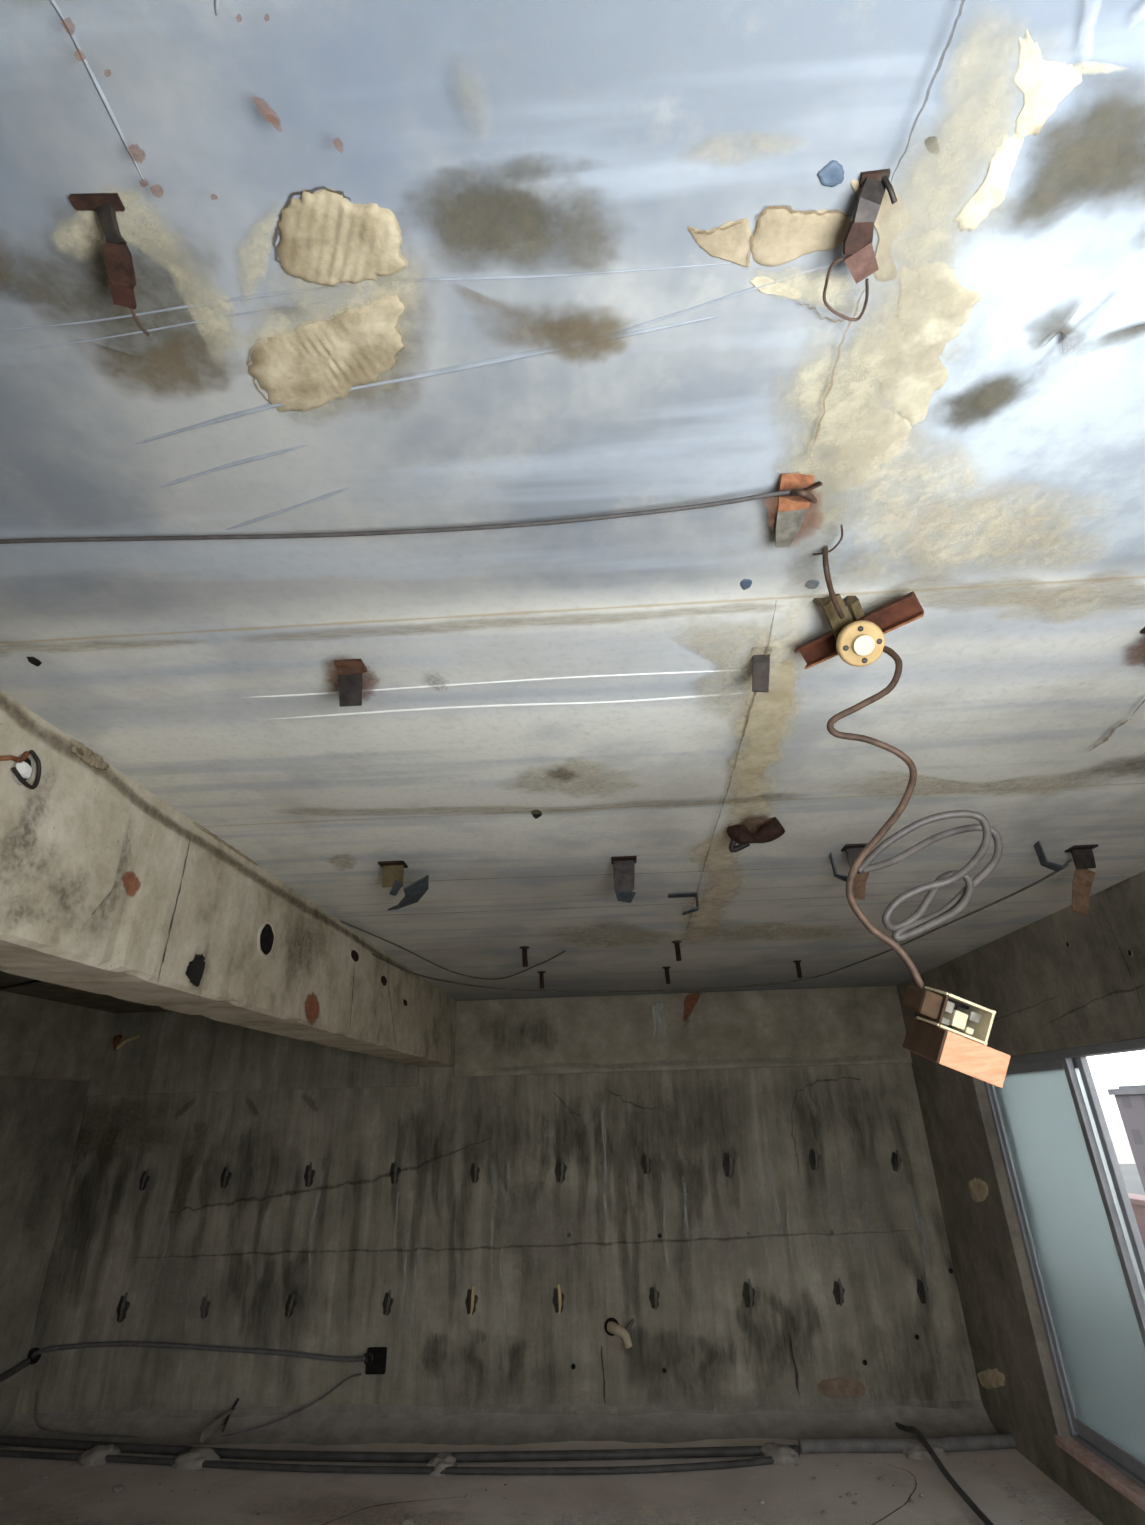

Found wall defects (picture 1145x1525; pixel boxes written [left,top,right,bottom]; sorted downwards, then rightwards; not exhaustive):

crack [891,0,965,182]
damp [1028,101,1145,218]
damp [10,244,205,391]
peeling [62,204,230,334]
spalling [243,186,411,412]
damp [443,194,606,266]
peeling [687,206,852,323]
peeling [794,30,1113,529]
rust [764,486,823,542]